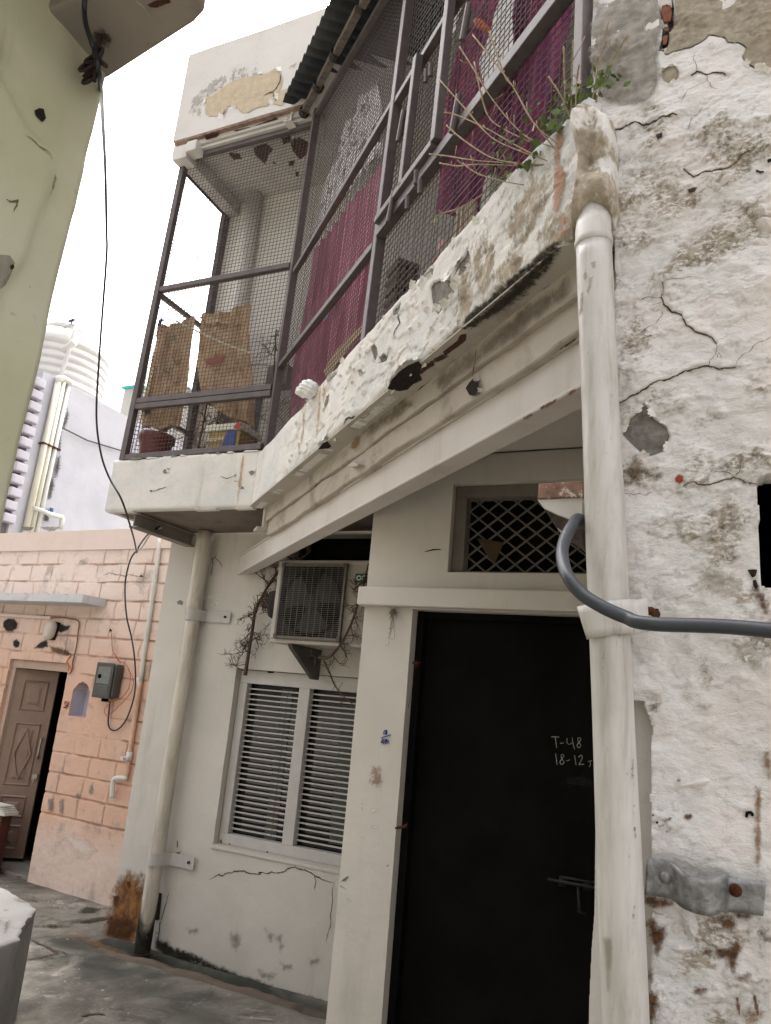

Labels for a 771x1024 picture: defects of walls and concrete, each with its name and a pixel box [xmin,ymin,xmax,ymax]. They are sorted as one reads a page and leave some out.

flaking render [662,0,771,85]
peeling [192,64,295,131]
crack [615,54,725,130]
crack [683,150,750,178]
spalling [382,237,470,334]
leakage [462,242,559,329]
crack [619,276,770,403]
spalling [621,401,670,458]
leakage [133,907,258,982]
corrosion [644,896,673,952]
corrosion [704,943,749,979]
corrosion [649,993,659,1024]